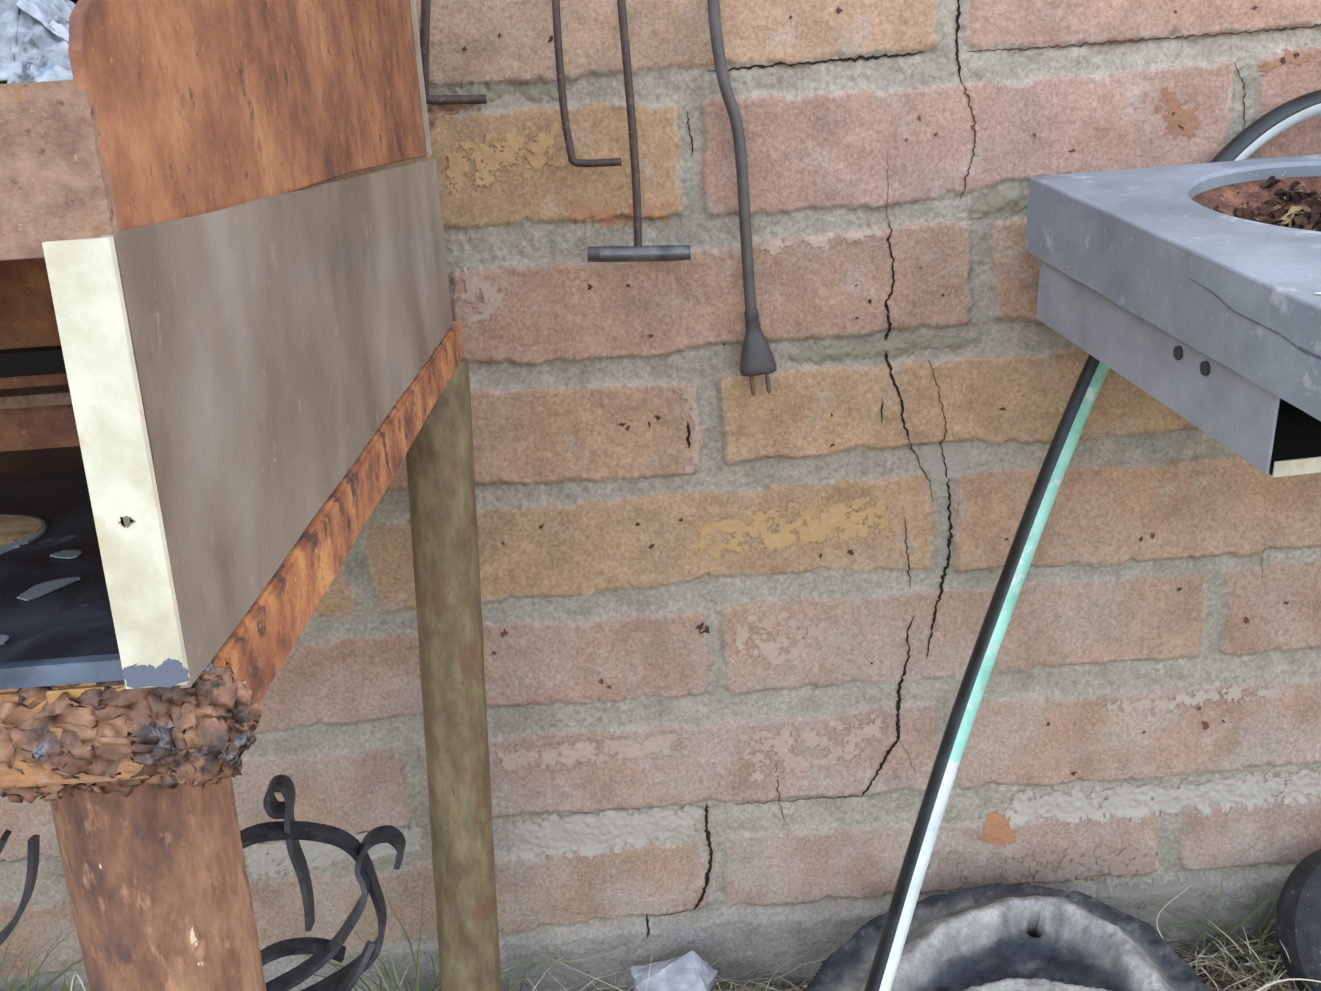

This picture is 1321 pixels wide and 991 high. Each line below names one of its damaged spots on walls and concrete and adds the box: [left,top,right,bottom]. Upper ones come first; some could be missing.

crack [646,155,953,938]